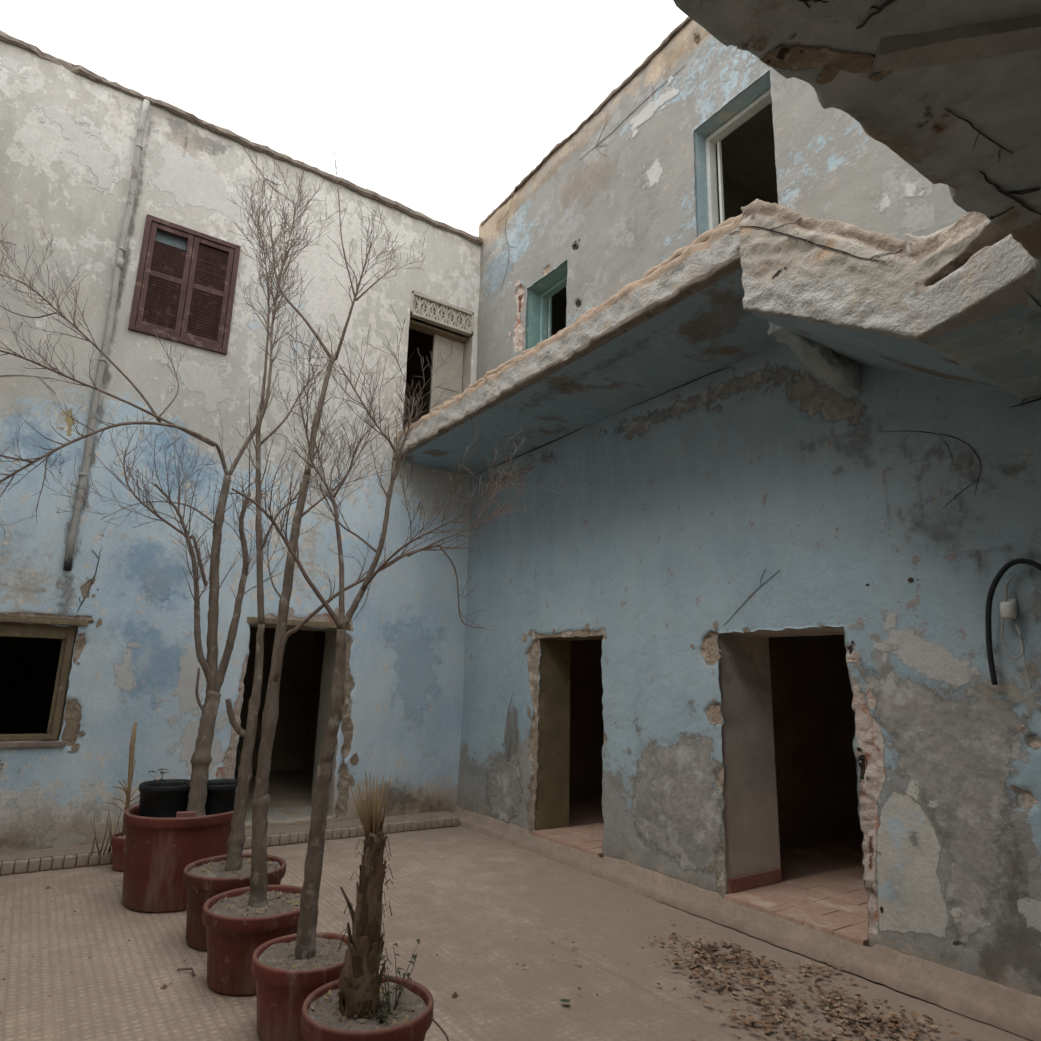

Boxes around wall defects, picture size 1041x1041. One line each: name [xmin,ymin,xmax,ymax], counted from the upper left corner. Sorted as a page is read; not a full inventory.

crack [798,0,828,8]
crack [856,0,896,29]
spalling [737,34,892,85]
crack [945,108,1041,220]
crack [729,218,902,262]
spalling [600,362,801,439]
spalling [0,612,102,665]
spalling [62,699,86,753]
spalling [251,607,359,818]
spalling [522,623,607,834]
peeling [623,699,726,893]
peeling [846,610,1041,960]